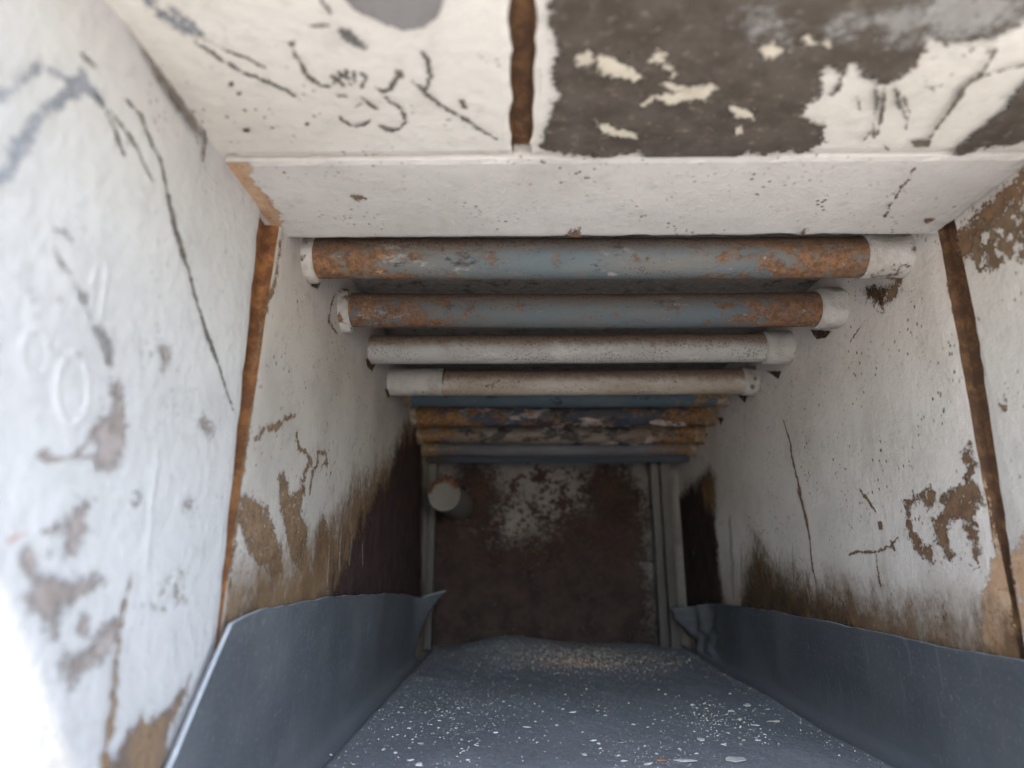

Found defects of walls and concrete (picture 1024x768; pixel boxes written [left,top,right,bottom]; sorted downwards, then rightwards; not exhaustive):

crack [412,51,498,140]
spalling [538,0,1024,158]
crack [0,53,234,410]
spalling [971,201,1024,273]
corrosion [226,162,284,607]
damp [224,421,658,647]
crack [783,420,817,583]
crack [848,489,899,587]
damp [741,540,1021,659]
spalling [901,440,986,570]
corrosion [980,479,1024,656]